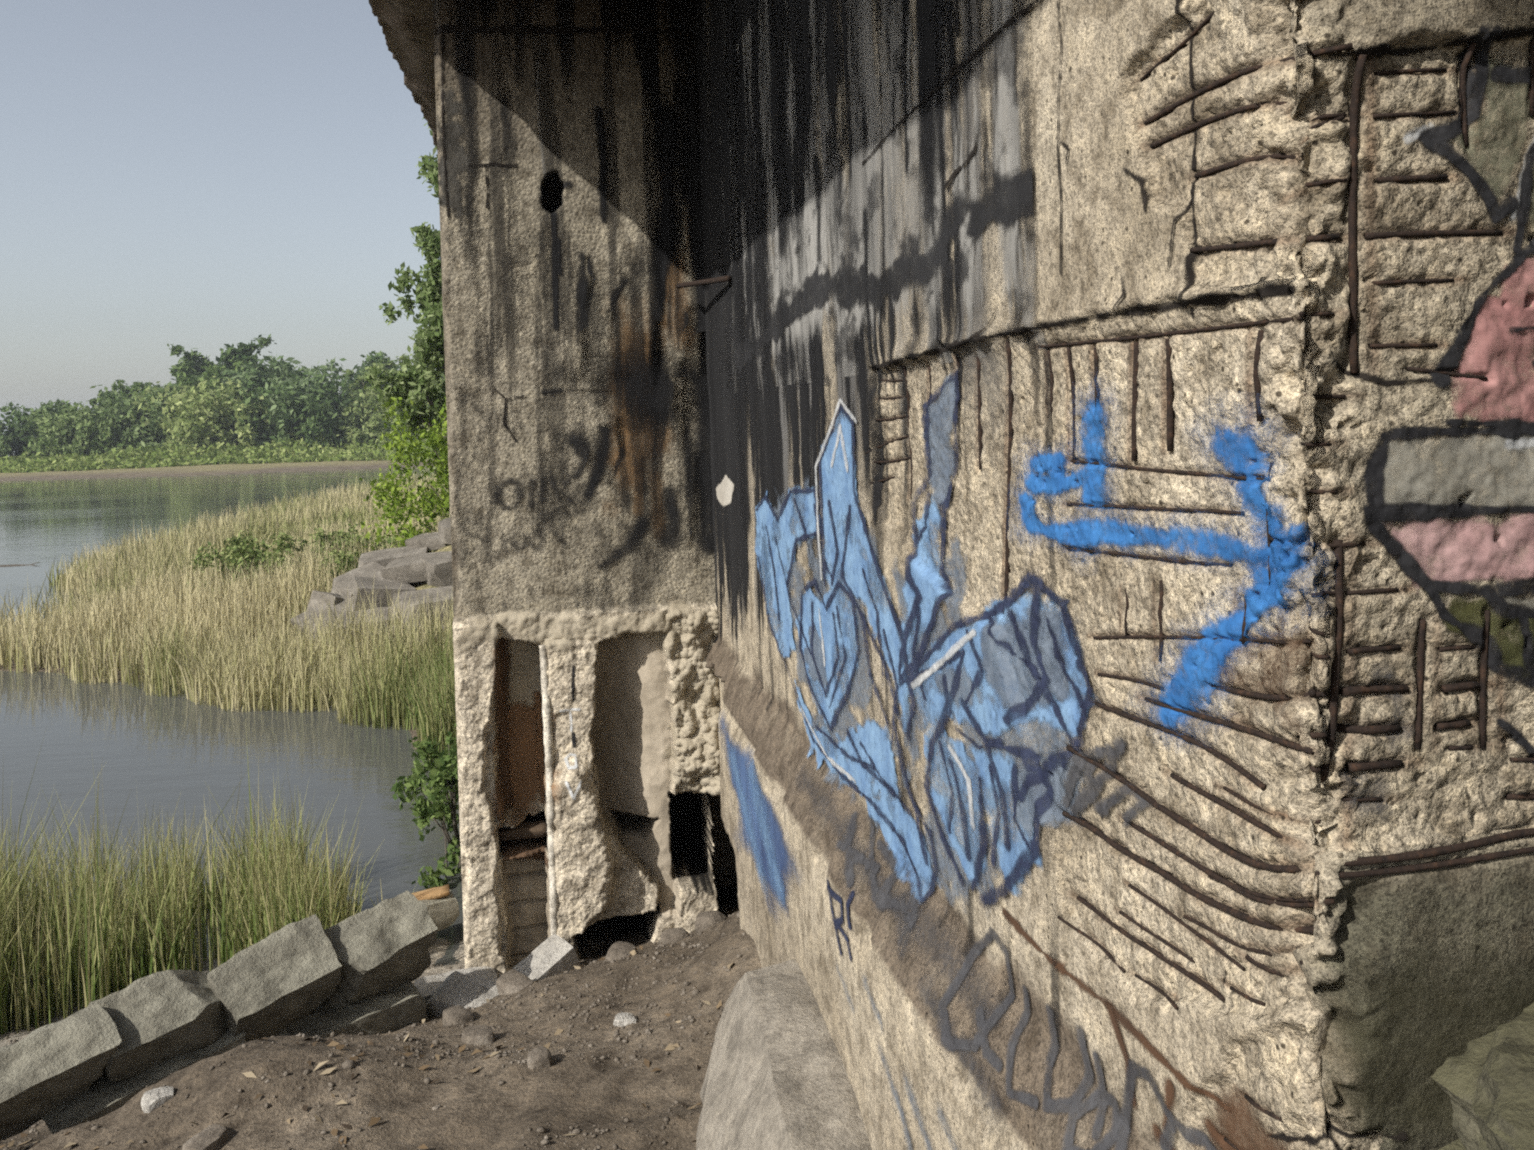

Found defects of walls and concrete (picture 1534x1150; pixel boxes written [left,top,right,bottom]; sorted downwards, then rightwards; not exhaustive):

water stain [455,44,514,361]
water stain [533,34,717,590]
water stain [704,0,1019,603]
spalling [503,853,551,969]
spalling [457,600,720,920]